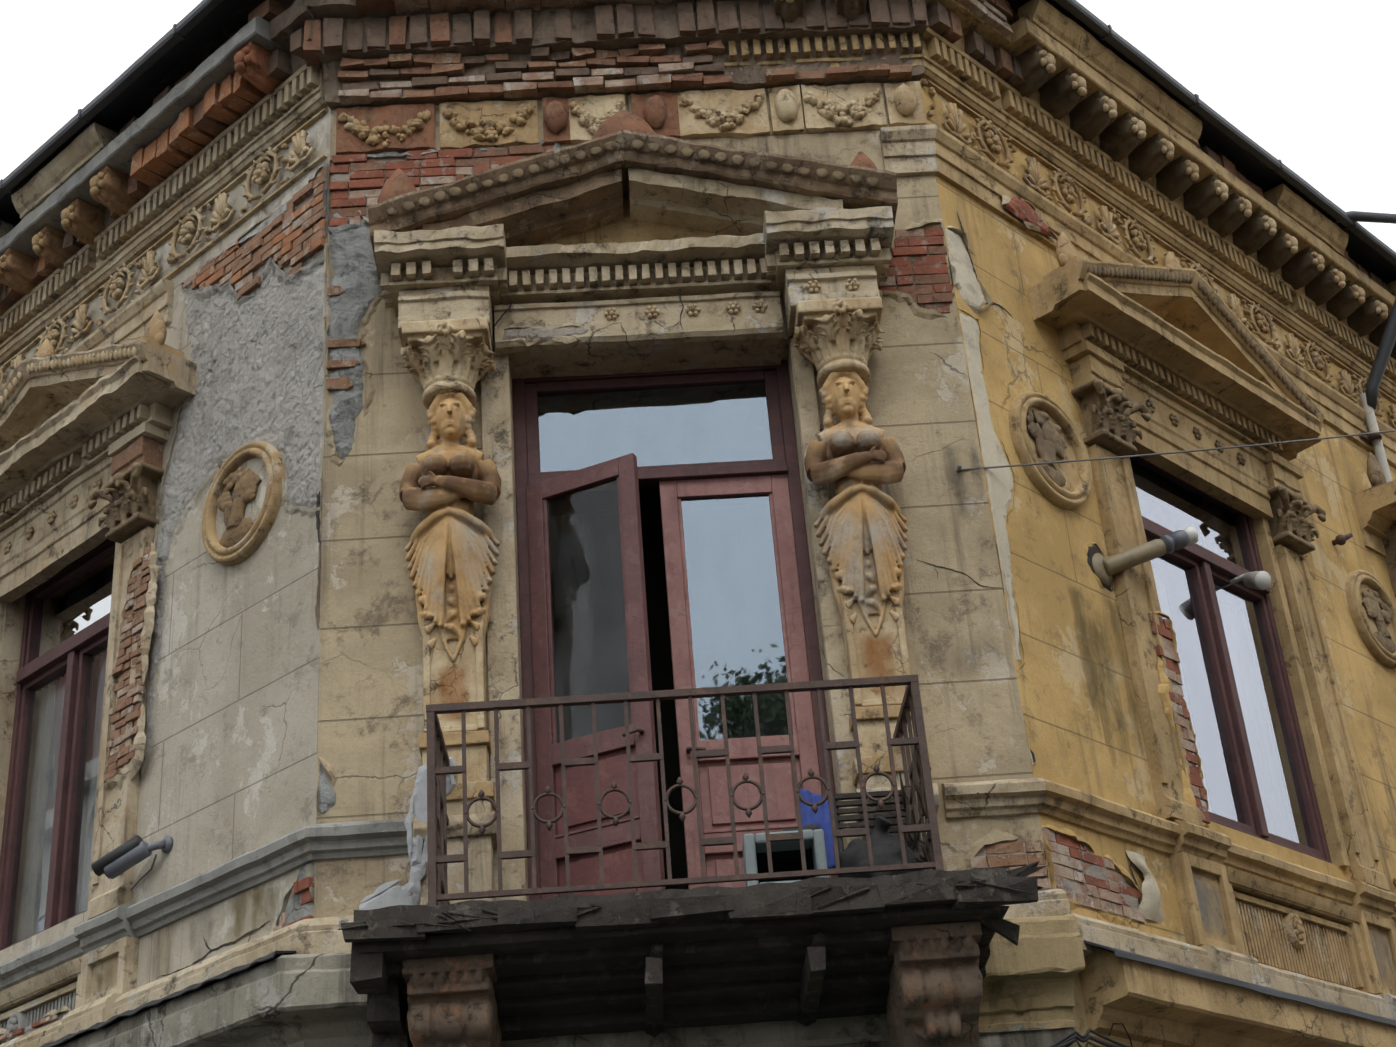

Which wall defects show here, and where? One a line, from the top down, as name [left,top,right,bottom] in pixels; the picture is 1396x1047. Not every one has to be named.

flaking render [103,140,560,795]
peeling [879,218,1025,670]
flaking render [1148,611,1211,828]
crack [156,920,271,978]
peeling [359,764,428,910]
flaking render [964,824,1145,927]